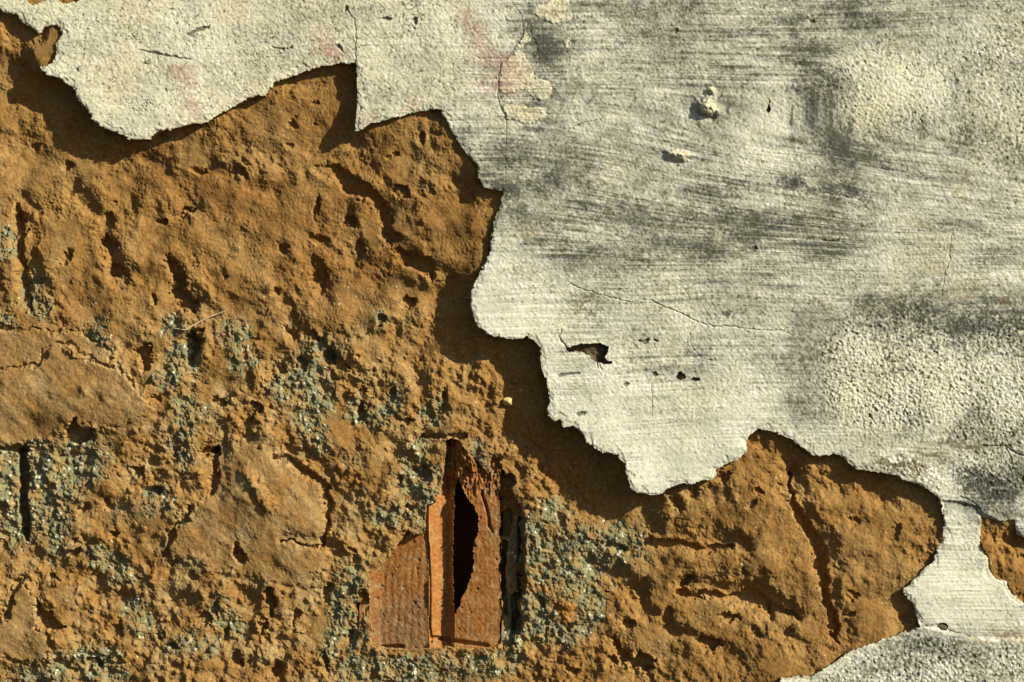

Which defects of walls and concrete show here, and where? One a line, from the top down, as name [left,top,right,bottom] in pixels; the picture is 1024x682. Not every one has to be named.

peeling [136,49,192,65]
crack [472,1,540,186]
peeling [500,32,554,125]
peeling [531,0,573,51]
crack [570,283,793,362]
spalling [359,605,373,639]
spalling [452,479,480,613]
spalling [506,567,527,627]
spalling [524,562,591,634]
spalling [979,517,1024,603]